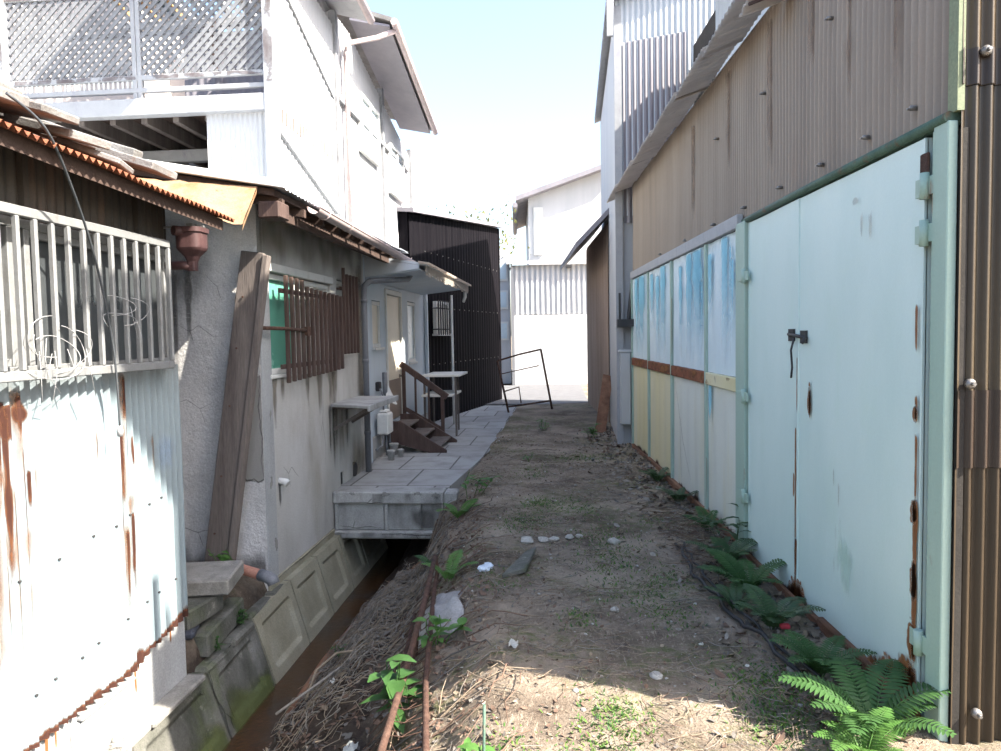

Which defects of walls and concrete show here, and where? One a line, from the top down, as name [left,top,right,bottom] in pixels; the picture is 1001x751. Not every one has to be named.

water stain [165,223,191,348]
corrosion [0,393,32,626]
corrosion [23,607,188,751]
corrosion [120,377,136,590]
corrosion [867,435,923,719]